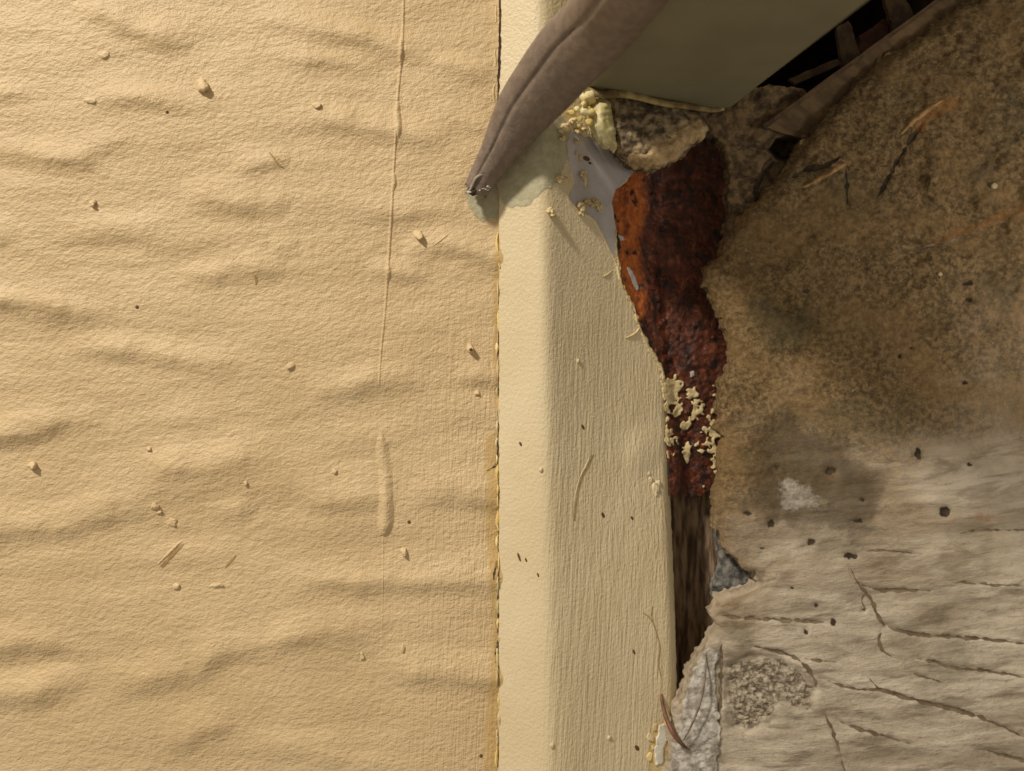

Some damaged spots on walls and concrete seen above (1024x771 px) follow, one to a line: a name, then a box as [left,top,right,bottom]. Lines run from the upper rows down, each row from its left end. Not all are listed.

peeling [566,131,721,474]
rust [612,138,727,498]
crack [716,644,724,725]
crack [722,614,823,623]
crack [825,714,910,771]
crack [754,549,1024,762]